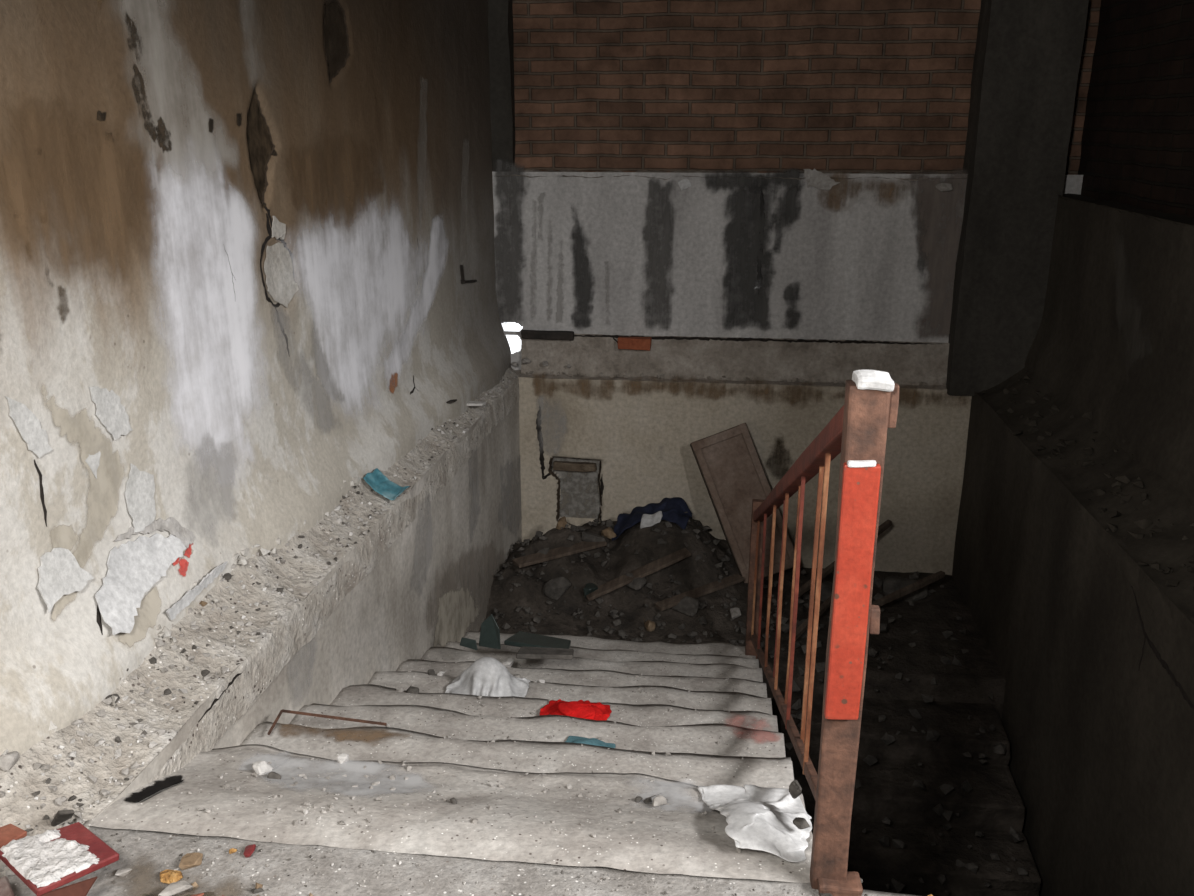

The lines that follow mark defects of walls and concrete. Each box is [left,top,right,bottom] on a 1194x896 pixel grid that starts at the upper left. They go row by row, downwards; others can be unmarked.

spalling [323,0,350,83]
damp [0,0,259,483]
damp [291,135,447,427]
damp [494,159,534,330]
damp [548,221,593,328]
damp [643,179,674,329]
damp [706,169,801,330]
damp [827,172,968,337]
peeling [37,385,195,647]